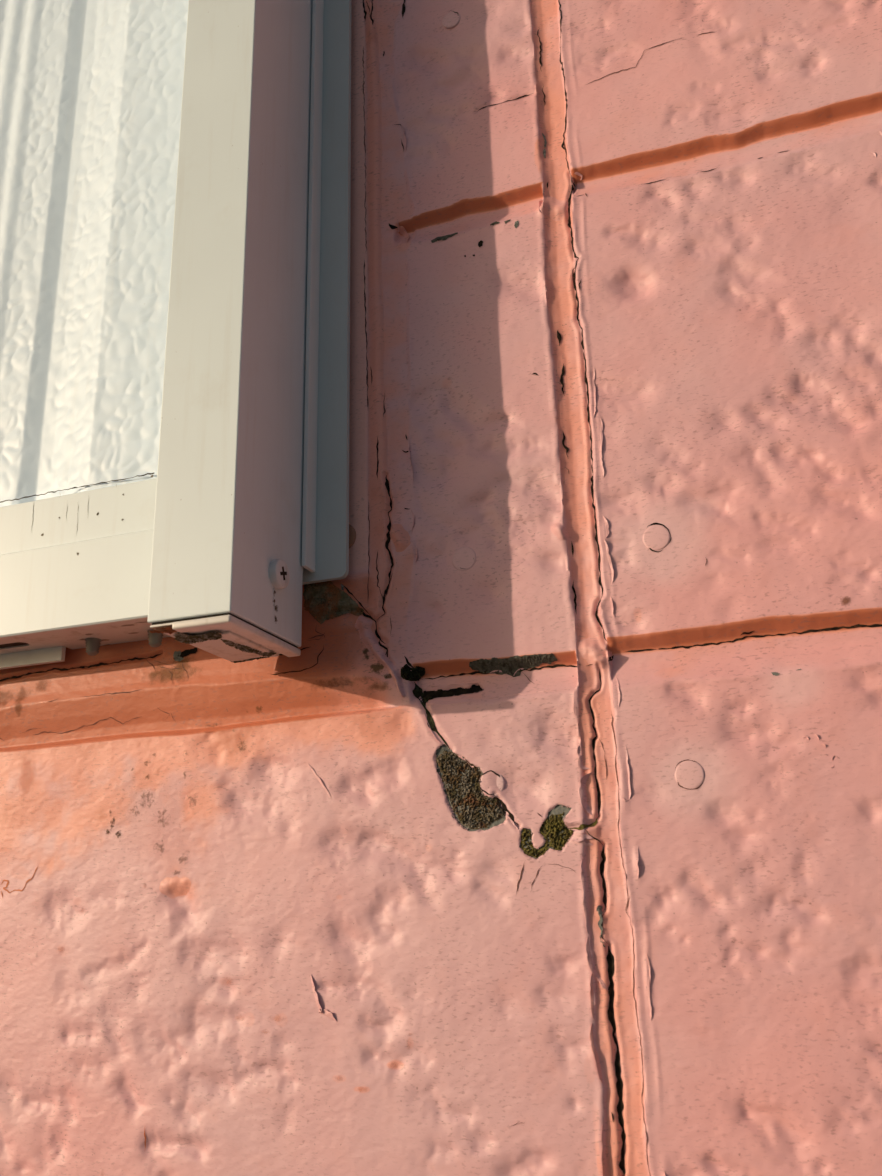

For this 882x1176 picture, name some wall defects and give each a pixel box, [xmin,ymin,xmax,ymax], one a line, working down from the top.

crack [478,0,882,1175]
crack [0,653,188,741]
crack [413,671,492,749]
peeling [422,653,557,704]